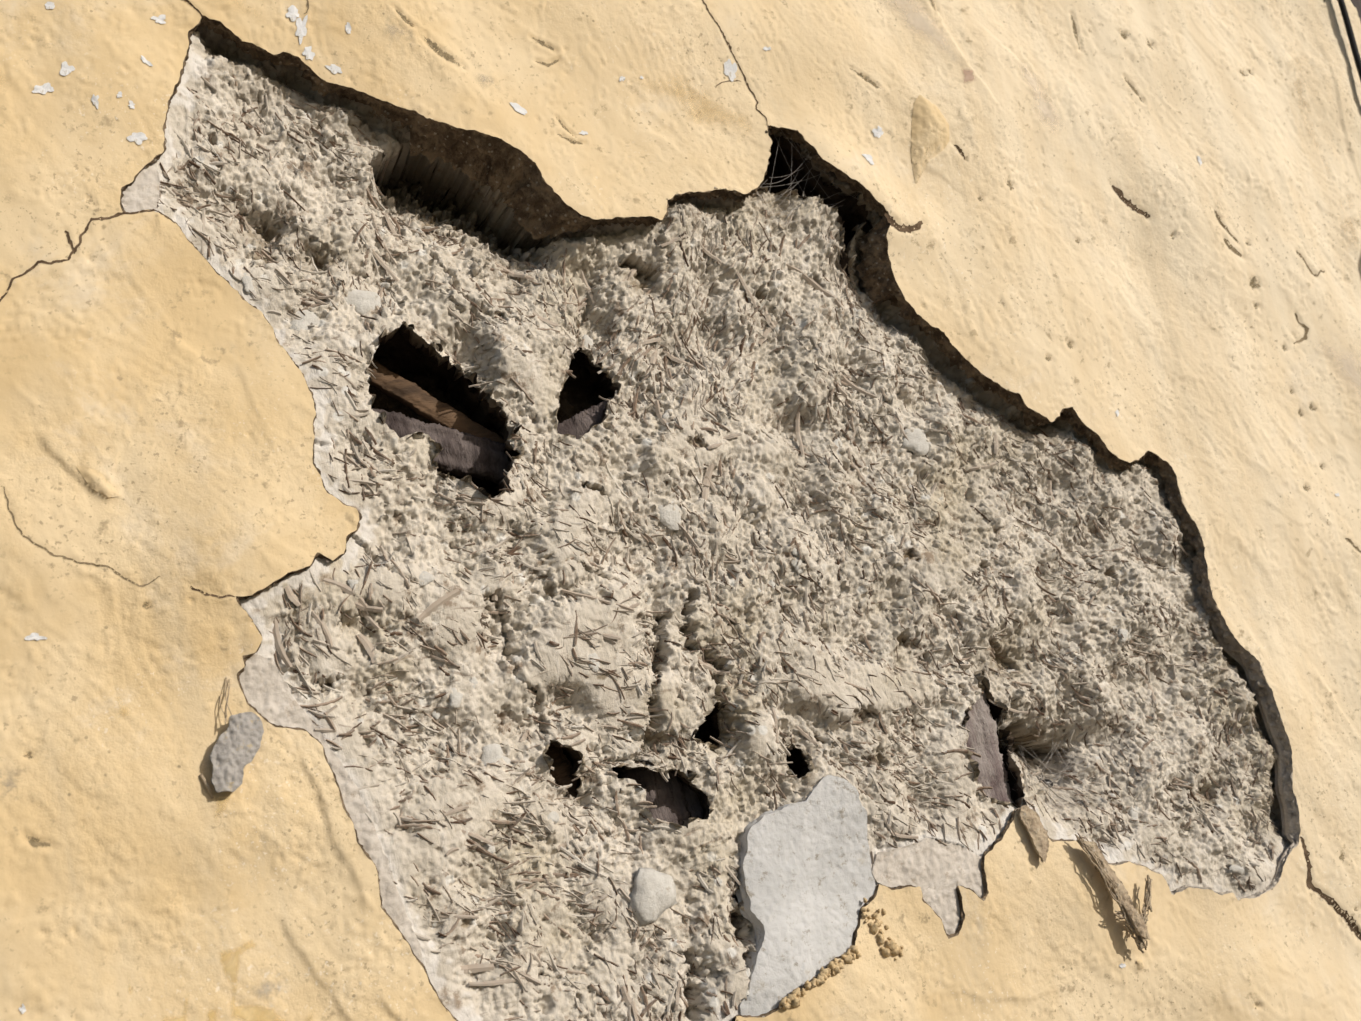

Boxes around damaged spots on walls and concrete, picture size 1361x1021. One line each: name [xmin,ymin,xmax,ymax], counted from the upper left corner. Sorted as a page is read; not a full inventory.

peeling [286,5,308,44]
spalling [425,38,459,65]
peeling [724,59,737,82]
crack [702,0,767,121]
peeling [127,132,148,145]
crack [0,209,175,302]
crack [1,486,160,587]
crack [191,586,235,598]
peeling [210,677,264,793]
peeling [1018,804,1049,863]
peeling [1075,834,1153,953]
crack [1300,836,1361,940]